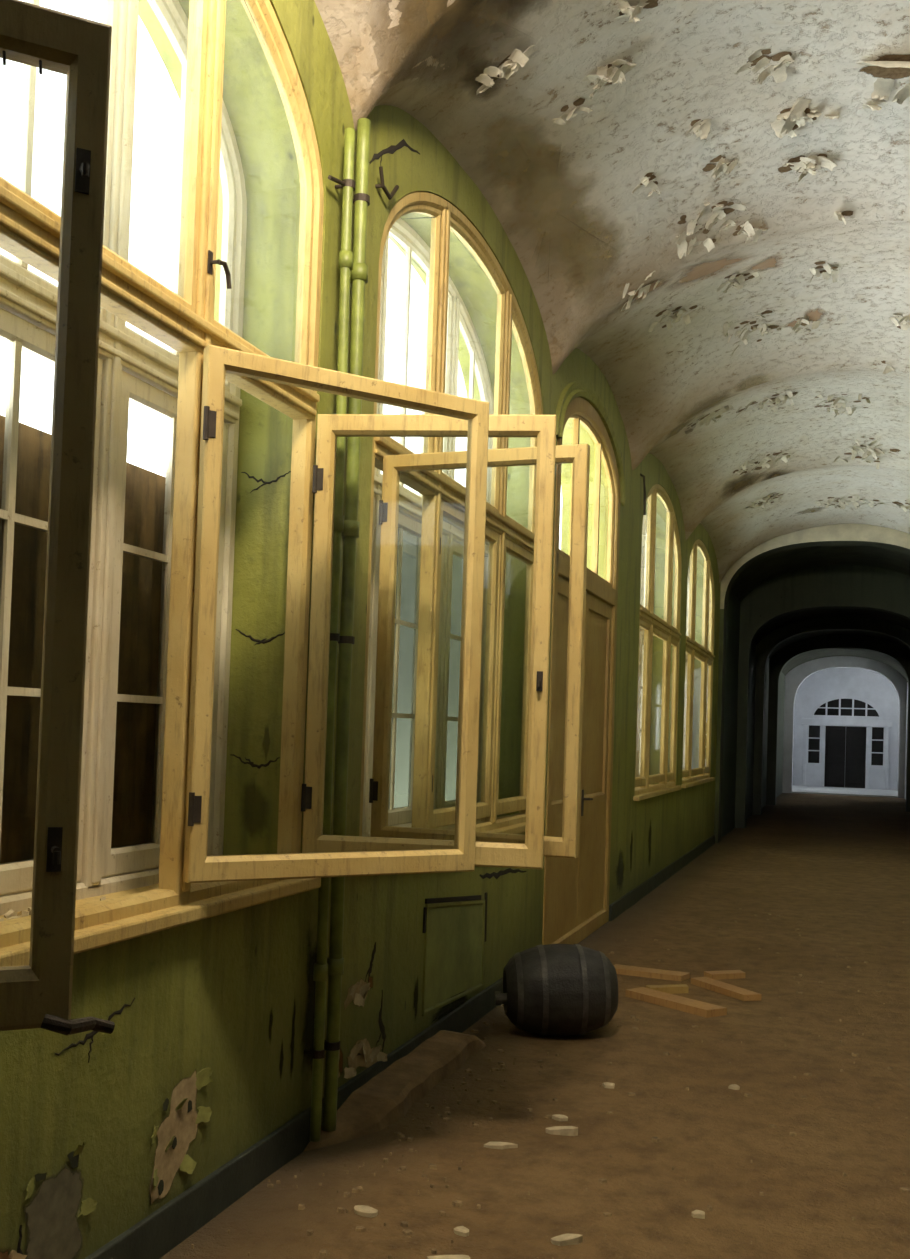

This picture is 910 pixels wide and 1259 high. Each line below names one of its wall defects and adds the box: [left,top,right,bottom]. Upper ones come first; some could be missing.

peeling [475,45,536,95]
peeling [734,49,795,85]
peeling [856,54,910,111]
peeling [769,95,839,138]
crack [369,139,420,166]
peeling [778,154,837,182]
peeling [675,201,768,259]
crack [241,471,291,493]
crack [236,629,285,645]
crack [230,754,281,769]
crack [55,997,135,1063]
peeling [150,1067,213,1204]